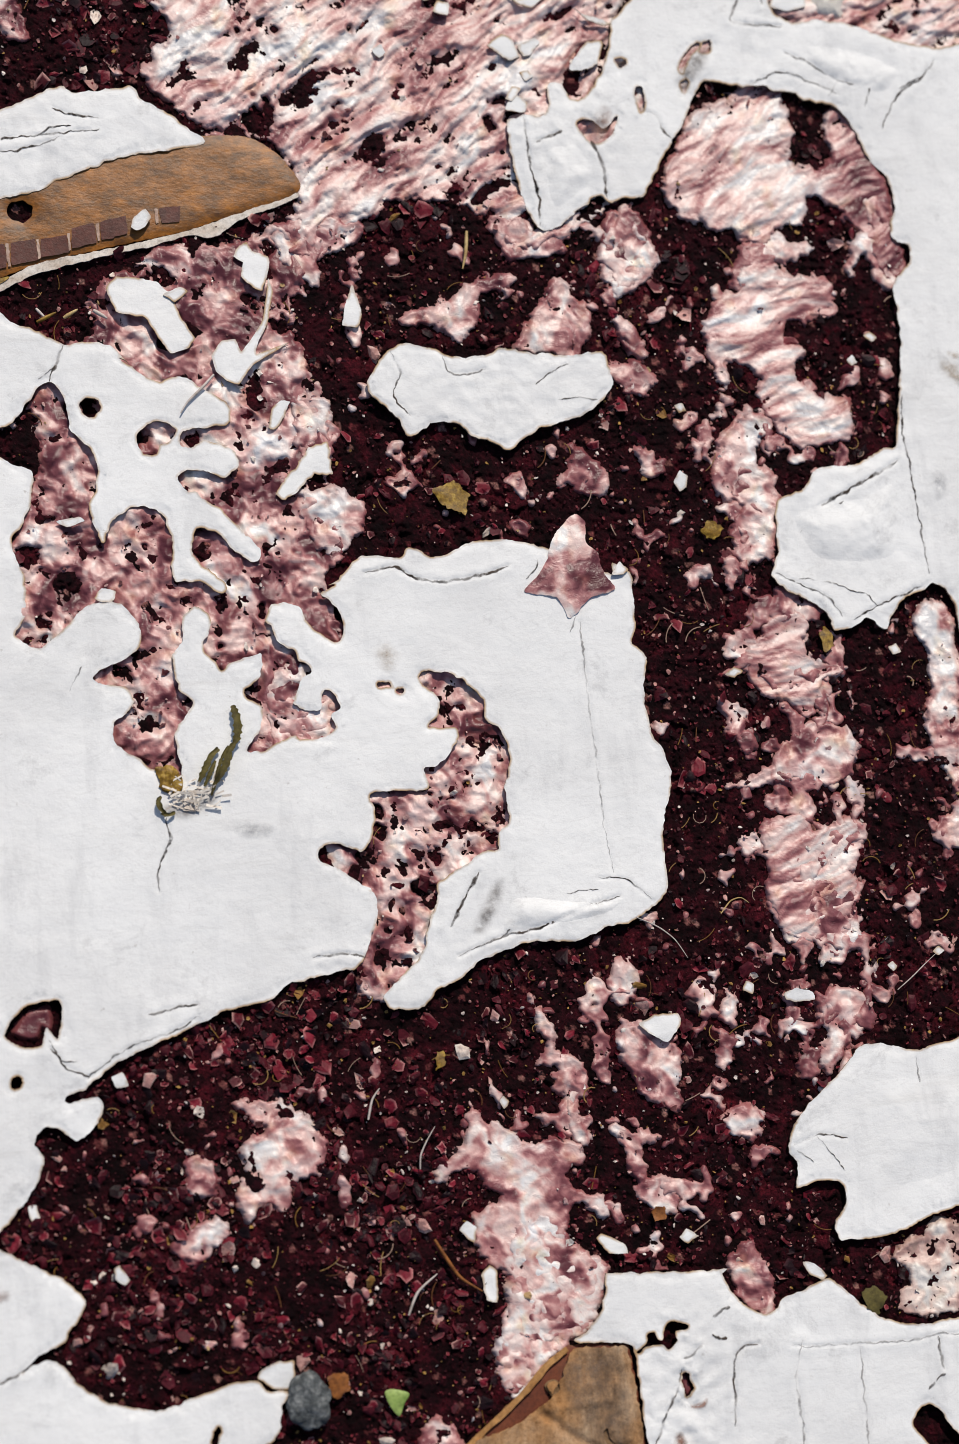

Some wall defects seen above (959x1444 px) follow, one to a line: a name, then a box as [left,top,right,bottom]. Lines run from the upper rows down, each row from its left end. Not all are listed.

peeling [0,0,634,261]
peeling [342,286,362,328]
peeling [0,205,358,776]
peeling [318,671,510,1003]
peeling [784,988,815,1002]
peeling [639,1013,681,1042]
peeling [528,1215,565,1276]
peeling [596,1234,628,1254]
peeling [481,1265,498,1302]
peeling [803,1261,827,1280]
peeling [258,1360,295,1391]
peeling [629,1345,648,1444]